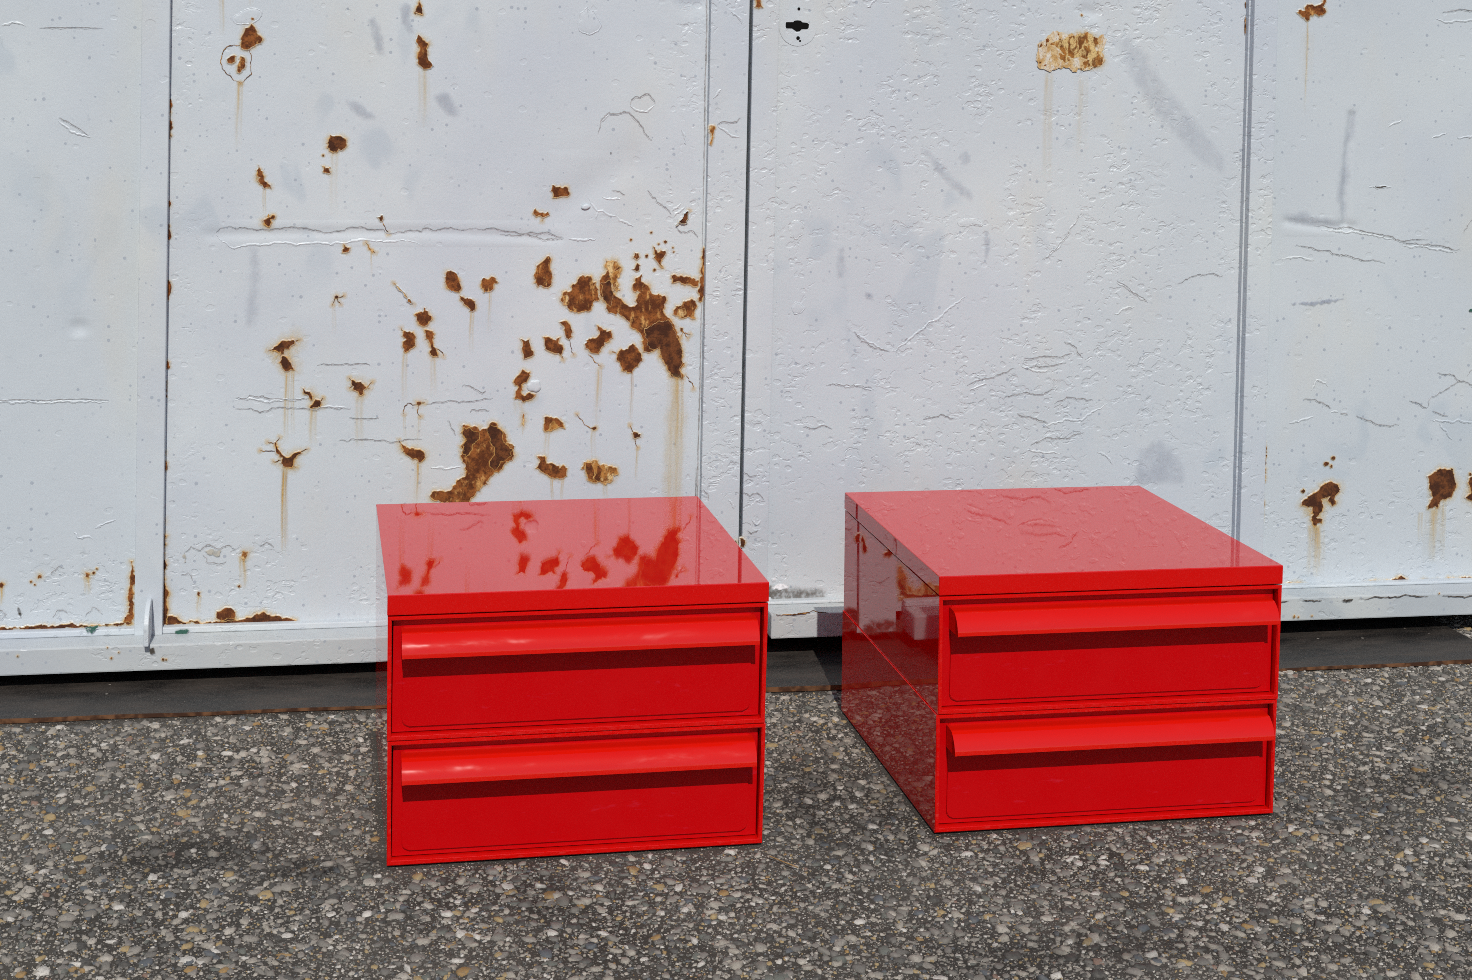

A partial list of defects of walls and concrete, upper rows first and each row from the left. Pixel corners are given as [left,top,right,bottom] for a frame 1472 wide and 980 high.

corrosion [1296,0,1327,22]
corrosion [220,18,264,94]
corrosion [415,34,434,71]
corrosion [1036,14,1107,72]
corrosion [322,134,348,175]
corrosion [444,269,499,313]
corrosion [394,283,444,358]
corrosion [512,232,699,425]
corrosion [399,421,516,503]
corrosion [535,455,619,486]
corrosion [1300,456,1341,543]
corrosion [1426,467,1472,520]